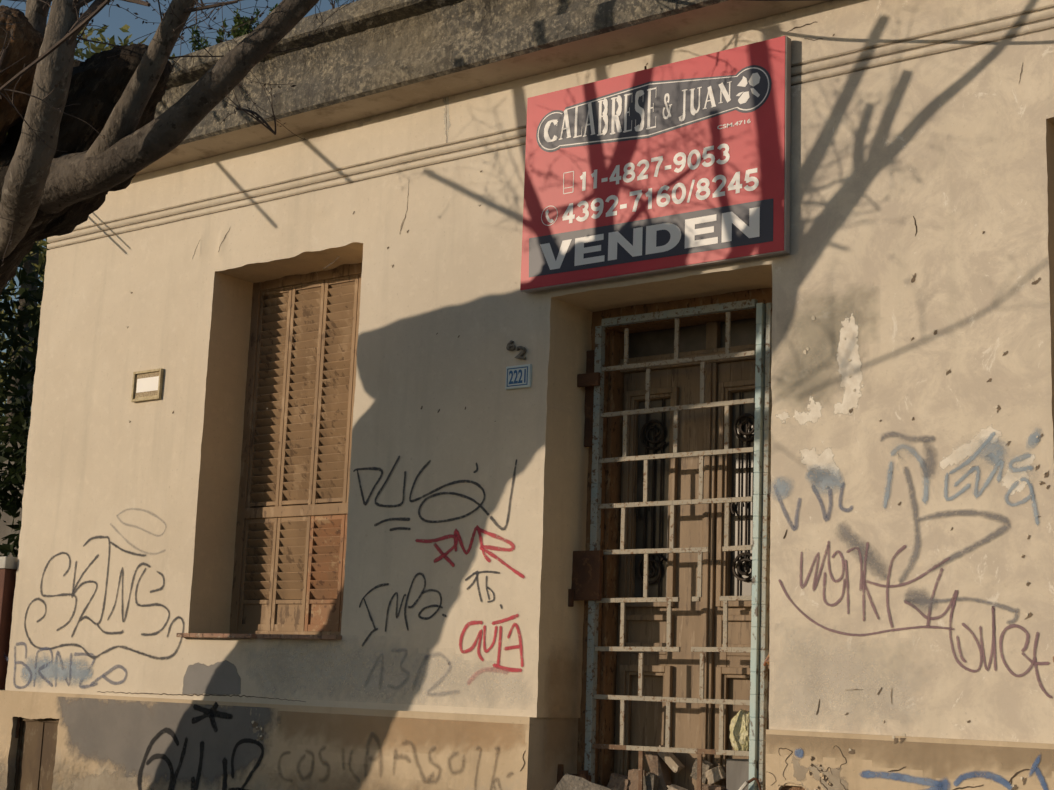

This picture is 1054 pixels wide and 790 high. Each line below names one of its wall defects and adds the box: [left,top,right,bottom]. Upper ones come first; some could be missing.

peeling [775,313,864,425]
peeling [800,447,841,489]
peeling [71,766,149,790]
spalling [778,756,848,790]